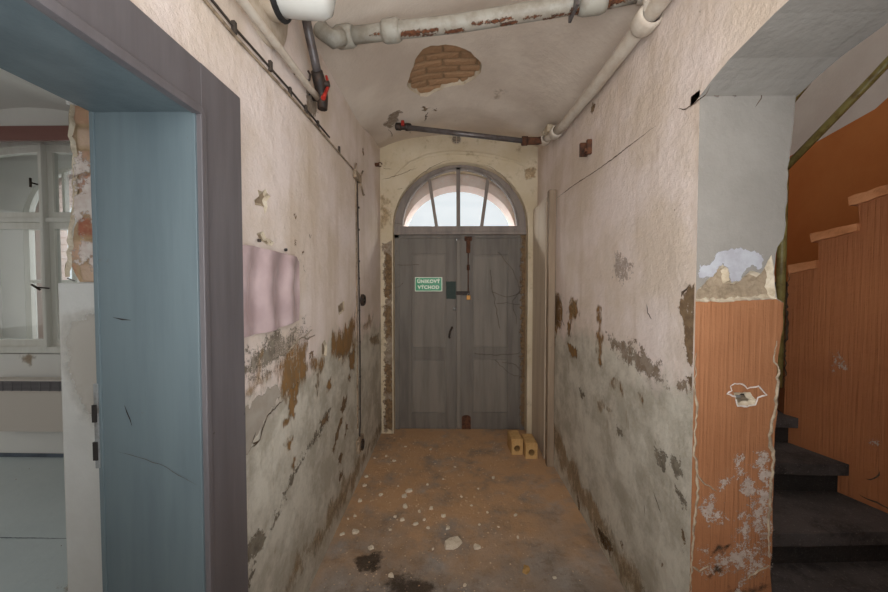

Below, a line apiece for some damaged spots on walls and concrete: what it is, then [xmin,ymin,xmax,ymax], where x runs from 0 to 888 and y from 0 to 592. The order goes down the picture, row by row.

flaking render [407,44,482,111]
flaking render [65,104,94,282]
flaking render [605,247,781,592]
leakage [355,552,380,572]
leakage [386,575,434,592]
leakage [554,428,641,592]